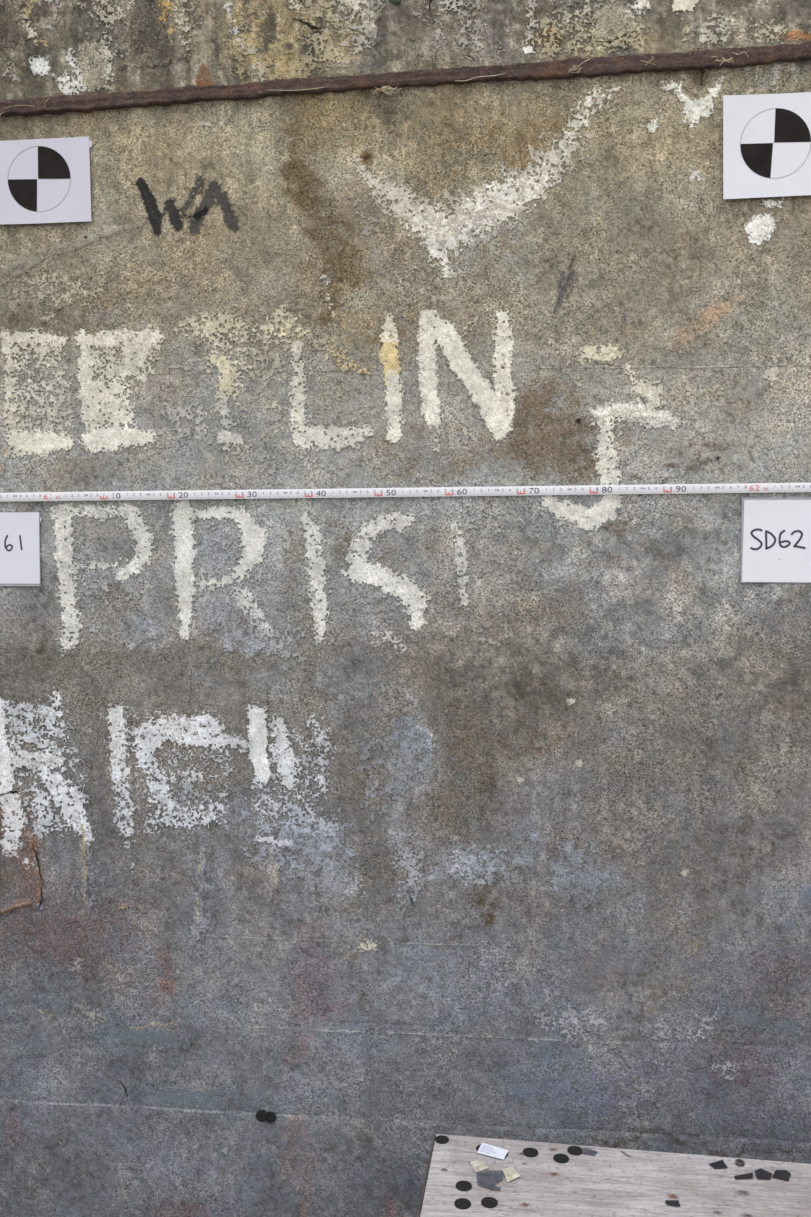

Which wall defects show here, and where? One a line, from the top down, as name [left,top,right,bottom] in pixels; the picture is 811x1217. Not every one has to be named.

rust [194,62,214,86]
crack [0,844,43,914]